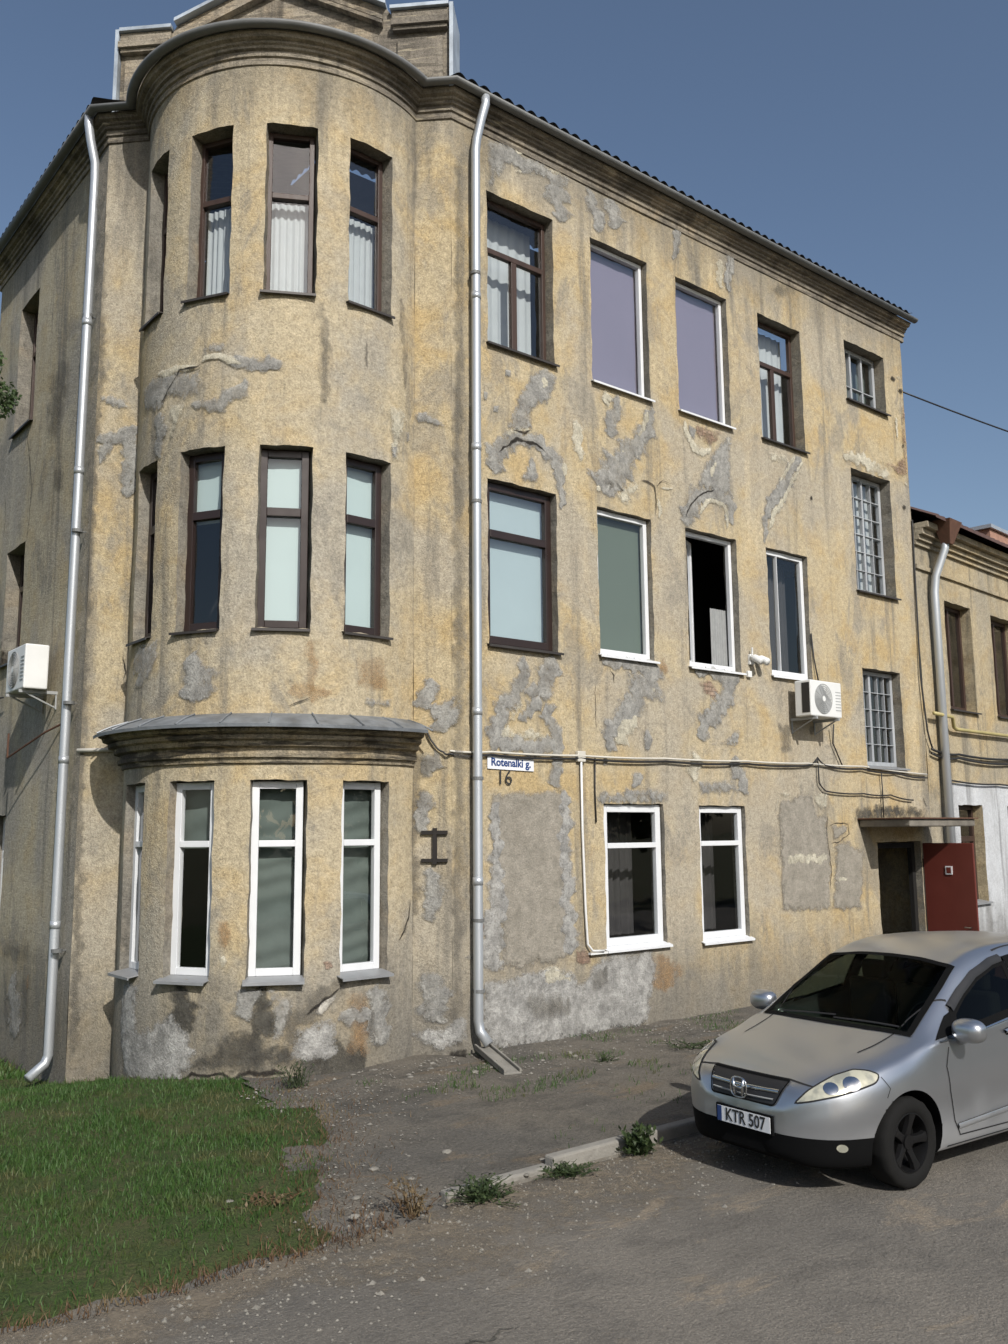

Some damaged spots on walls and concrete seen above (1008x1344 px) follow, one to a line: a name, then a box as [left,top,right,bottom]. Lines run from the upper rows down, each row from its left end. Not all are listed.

peeling [158,353,240,378]
spalling [683,421,729,477]
peeling [615,715,637,745]
spalling [577,950,590,964]
peeling [545,967,570,983]
spalling [412,973,467,1057]